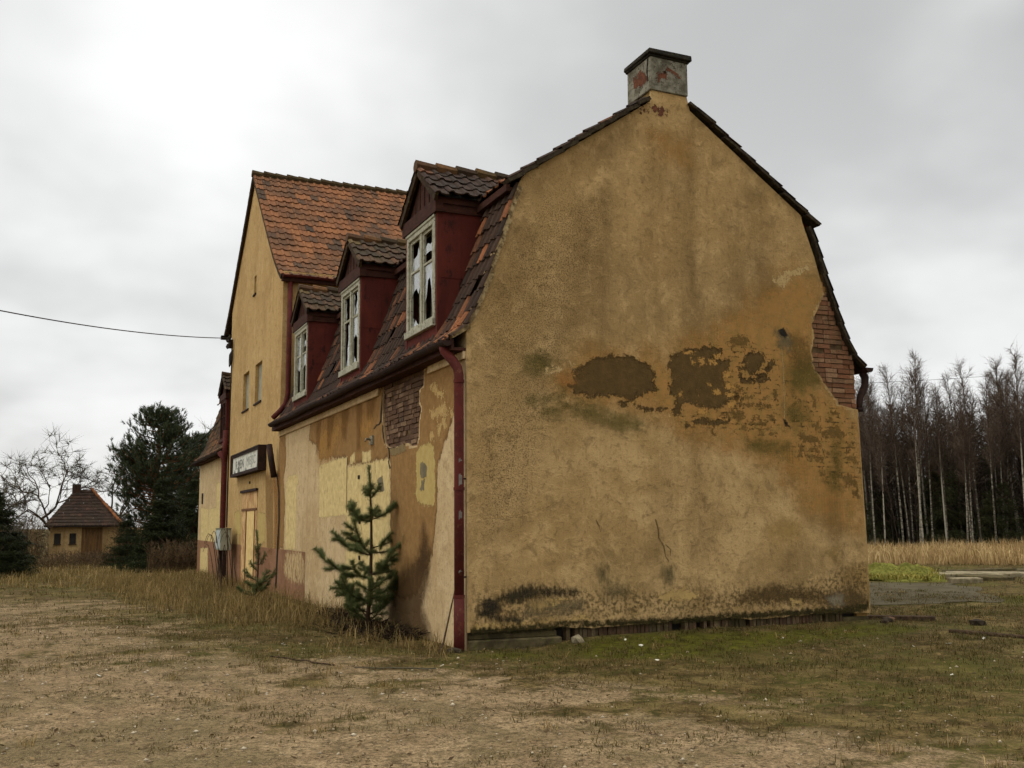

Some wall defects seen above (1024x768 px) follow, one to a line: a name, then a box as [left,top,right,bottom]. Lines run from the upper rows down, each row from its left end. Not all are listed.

flaking render [633,67,681,89]
peeling [279,435,305,586]
peeling [309,365,454,582]
peeling [560,275,861,526]
water stain [477,584,583,625]